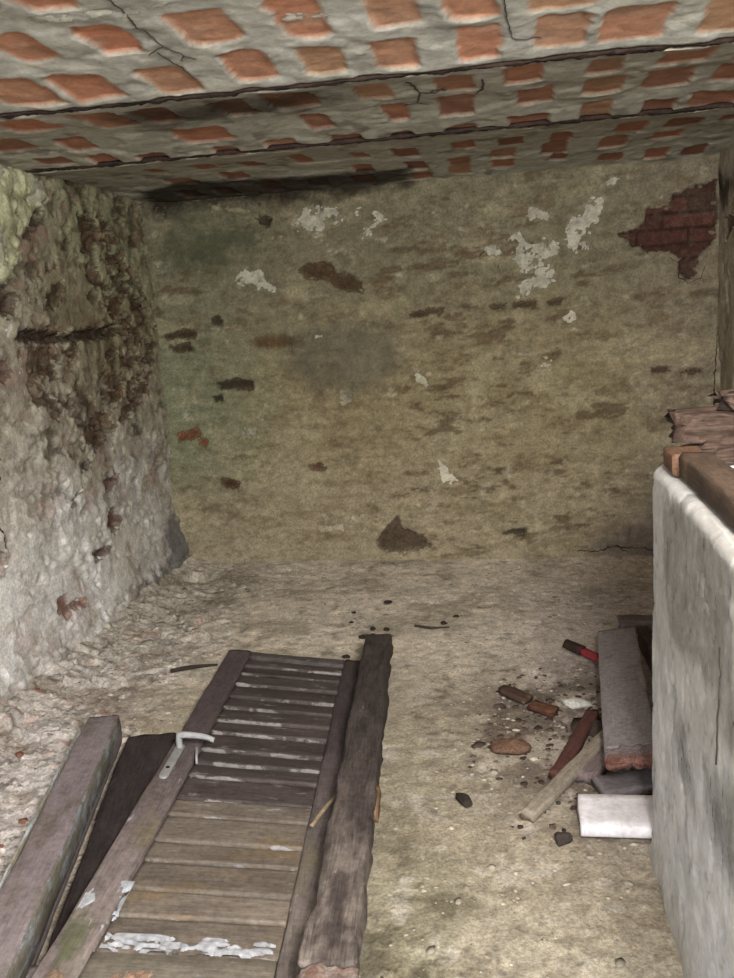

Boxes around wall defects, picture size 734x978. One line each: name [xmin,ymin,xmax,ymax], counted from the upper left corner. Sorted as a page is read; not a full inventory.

crack [107,0,197,80]
spalling [618,179,734,280]
spalling [0,210,198,474]